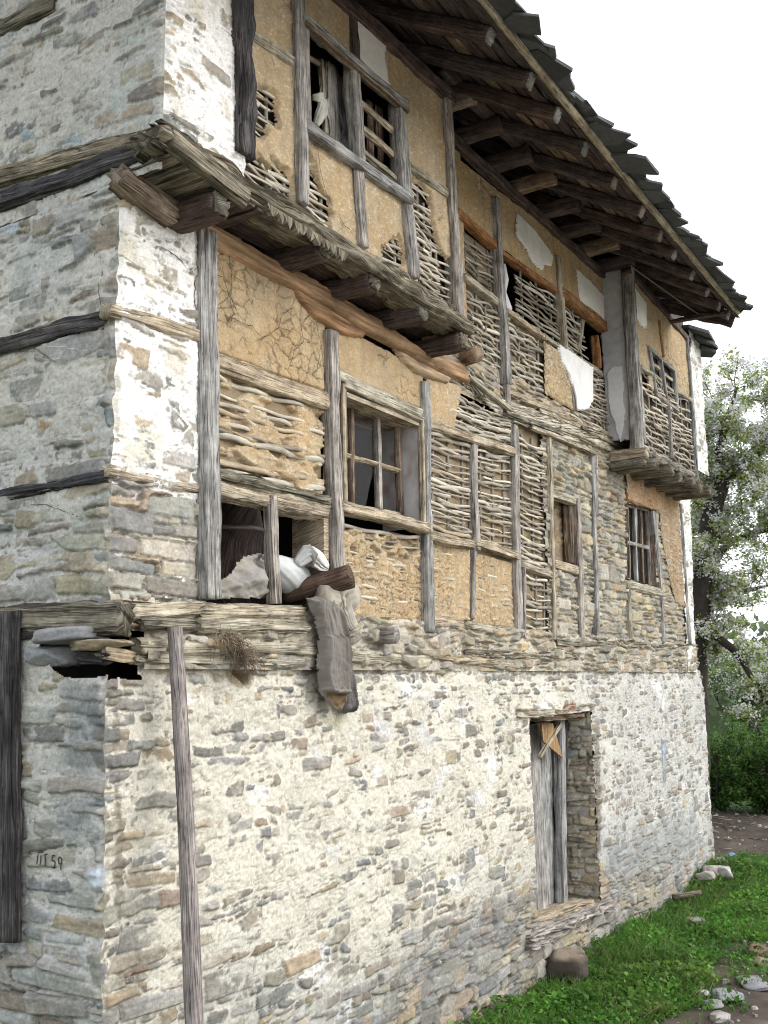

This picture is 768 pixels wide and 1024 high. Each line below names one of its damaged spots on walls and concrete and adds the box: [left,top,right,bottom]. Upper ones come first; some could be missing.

spalling [255,90,275,138]
spalling [244,160,291,195]
spalling [305,163,329,227]
spalling [381,238,402,268]
spalling [412,183,451,303]
flaking render [515,214,553,270]
crack [158,244,322,369]
flaking render [576,269,605,320]
flaking render [557,345,594,411]